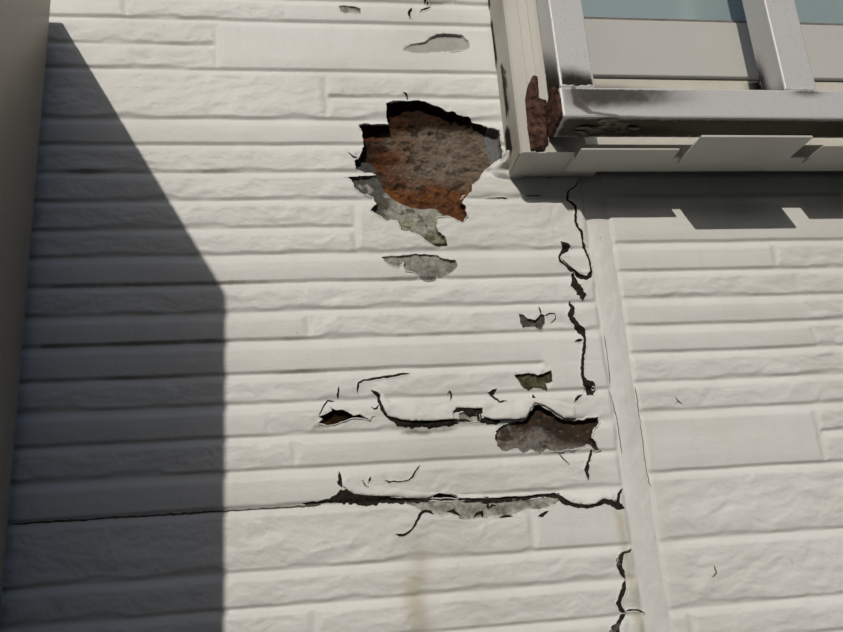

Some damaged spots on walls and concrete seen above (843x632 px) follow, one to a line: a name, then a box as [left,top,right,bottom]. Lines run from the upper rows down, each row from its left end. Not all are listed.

peeling [338,5,362,14]
peeling [402,33,471,54]
spalling [344,100,504,283]
crack [485,177,543,201]
peeling [518,313,546,332]
crack [539,179,622,452]
crack [14,464,625,536]
crack [319,372,507,429]
spalling [380,369,601,455]
crack [558,448,594,480]
crack [635,388,650,485]
crack [609,547,645,632]